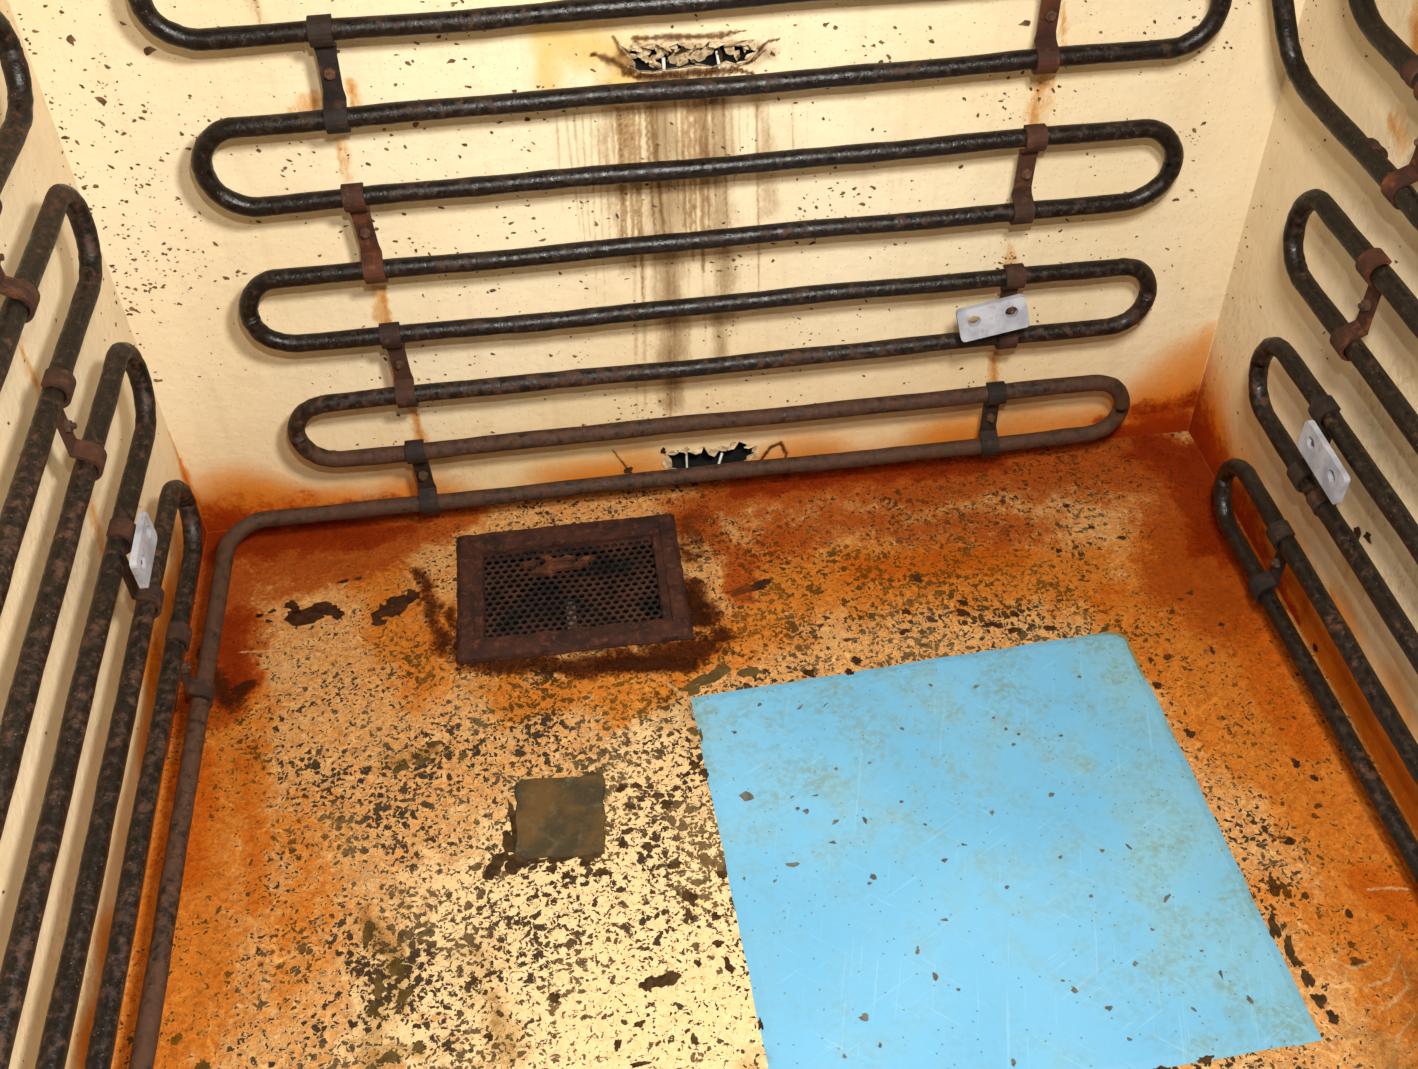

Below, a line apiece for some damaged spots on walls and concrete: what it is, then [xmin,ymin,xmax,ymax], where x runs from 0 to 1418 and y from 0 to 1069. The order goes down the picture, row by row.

spalling [575,11,799,80]
peeling [962,67,1077,121]
peeling [43,5,248,348]
peeling [340,128,467,181]
peeling [795,166,876,220]
spalling [661,441,787,469]
corrosion [1092,404,1221,478]
corrosion [189,514,240,627]
corrosion [234,521,411,555]
corrosion [523,555,596,577]
corrosion [412,568,731,677]
corrosion [214,618,261,707]